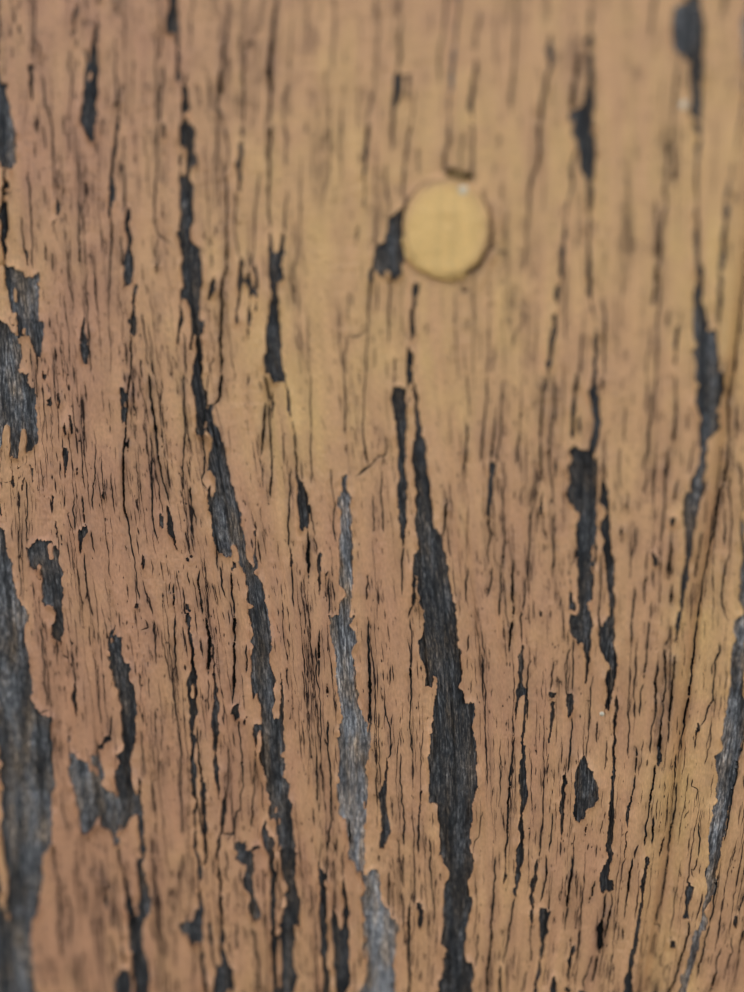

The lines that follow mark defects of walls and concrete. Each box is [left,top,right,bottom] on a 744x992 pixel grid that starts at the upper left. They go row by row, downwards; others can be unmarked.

peeling [0,506,56,992]
peeling [0,79,60,490]
peeling [26,538,66,643]
peeling [68,628,152,992]
peeling [163,0,301,992]
peeling [317,474,424,992]
peeling [368,196,408,283]
peeling [391,281,478,992]
peeling [503,645,551,992]
peeling [546,0,631,893]
peeling [670,0,744,642]
peeling [678,506,744,992]